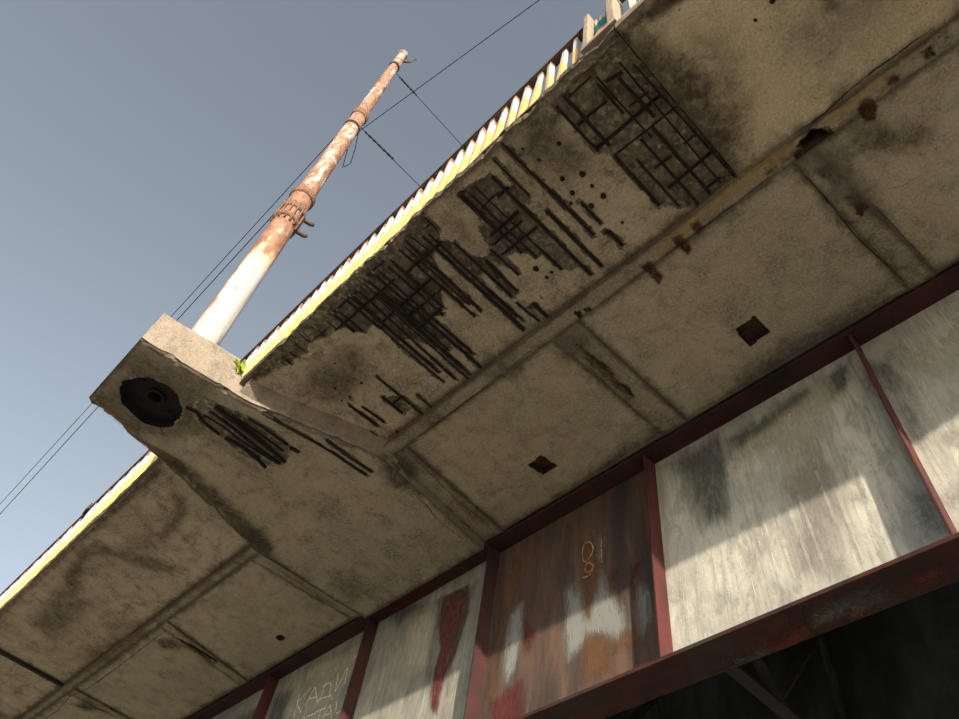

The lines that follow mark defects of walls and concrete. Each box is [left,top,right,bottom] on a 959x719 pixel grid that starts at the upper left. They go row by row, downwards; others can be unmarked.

spalling [549,37,737,210]
hole [789,126,834,160]
rust [858,97,877,121]
spalling [242,141,627,386]
rust [642,262,663,283]
rust [673,235,692,254]
spalling [184,396,375,478]
spalling [334,387,399,437]
spalling [374,374,433,415]
spalling [576,343,635,398]